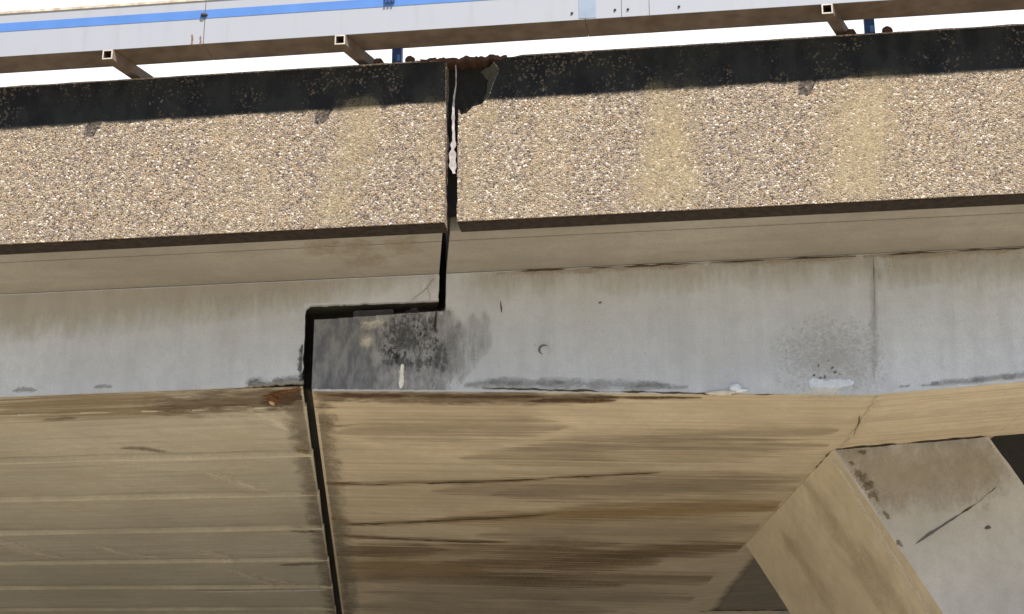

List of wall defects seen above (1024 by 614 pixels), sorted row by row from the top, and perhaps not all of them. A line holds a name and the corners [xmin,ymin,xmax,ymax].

leakage [300,308,749,408]
leakage [0,388,297,416]
rust [261,386,303,411]
crack [816,396,1001,468]
crack [916,487,996,544]